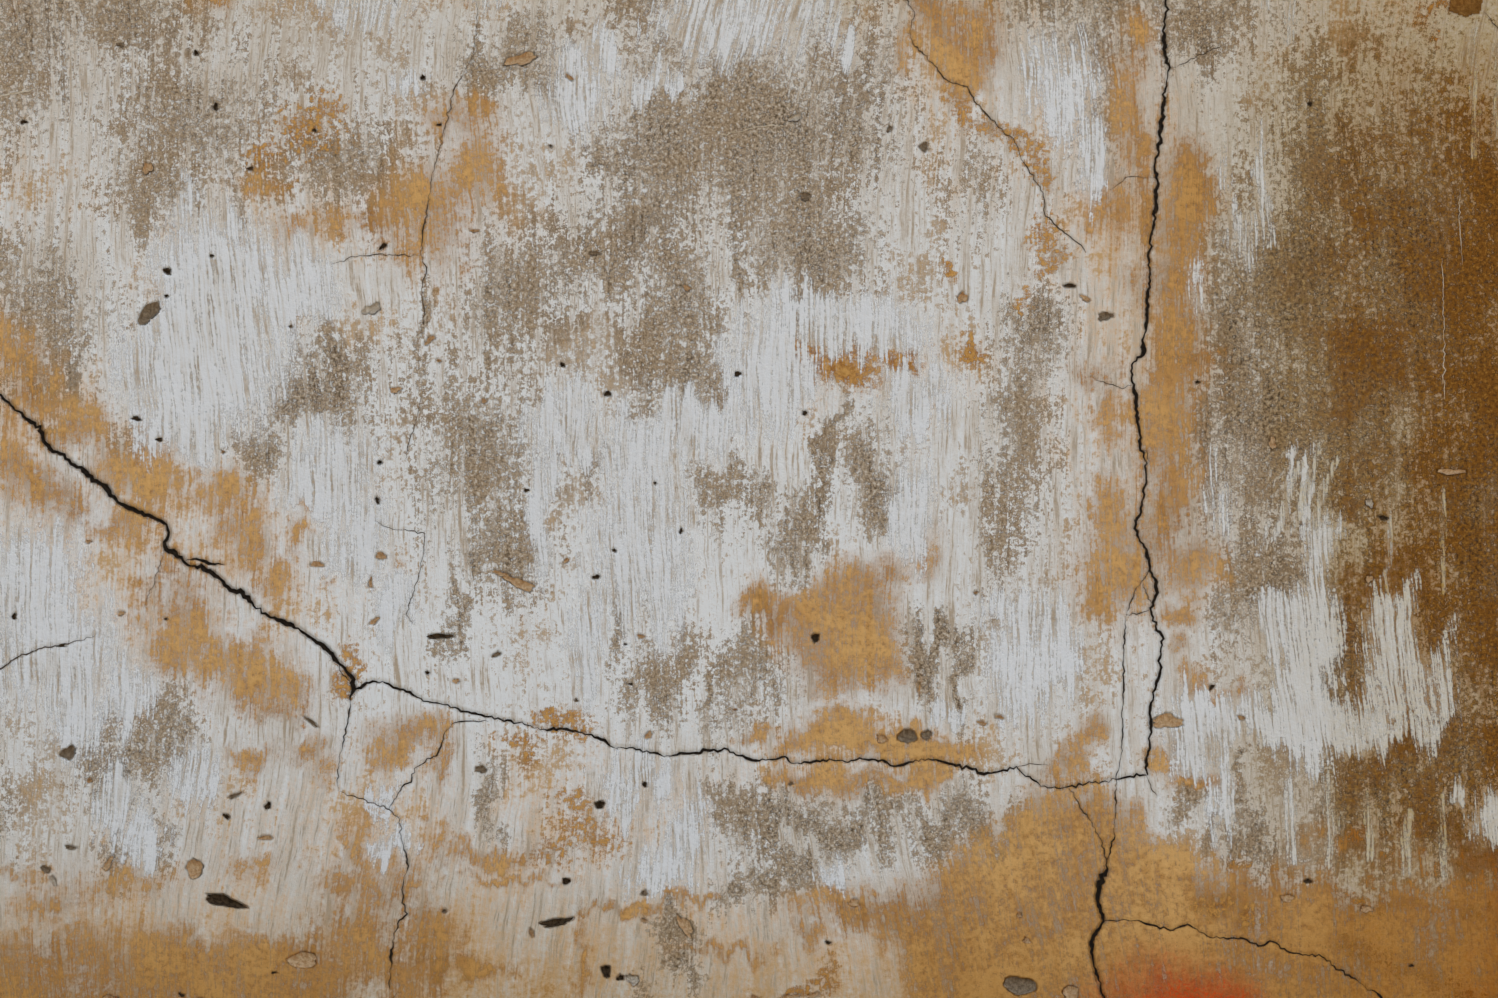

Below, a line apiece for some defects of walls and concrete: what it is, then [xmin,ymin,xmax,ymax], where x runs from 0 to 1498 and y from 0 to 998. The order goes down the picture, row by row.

crack [389,819,409,969]
flaking render [0,0,1114,998]
crack [0,0,1173,827]
flaking render [952,0,1498,888]
crack [1069,789,1383,998]